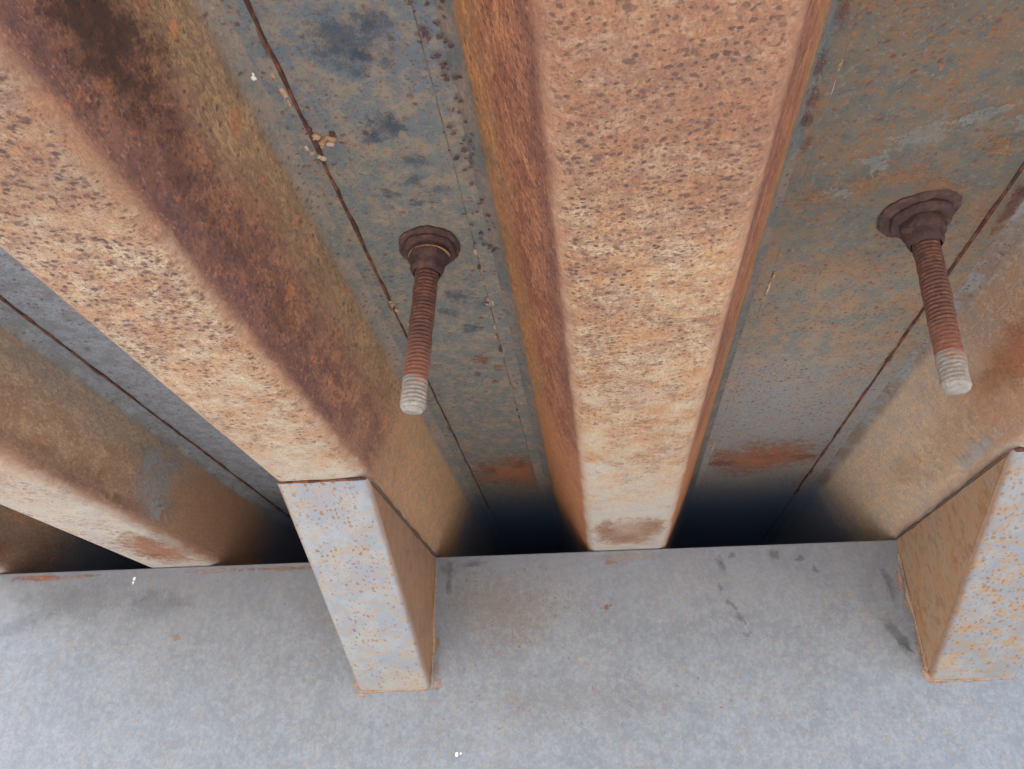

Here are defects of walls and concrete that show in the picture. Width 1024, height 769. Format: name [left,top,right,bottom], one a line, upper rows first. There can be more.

corrosion [45,0,170,126]
corrosion [417,21,463,82]
corrosion [443,97,475,186]
corrosion [709,442,815,476]